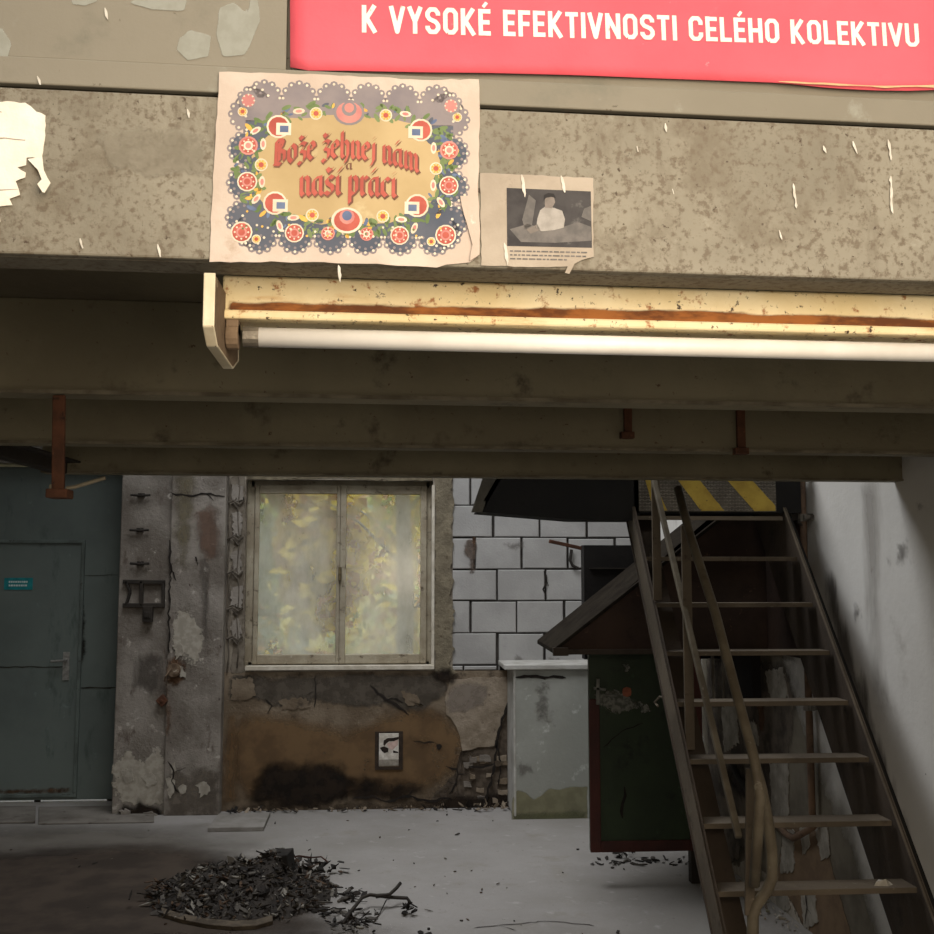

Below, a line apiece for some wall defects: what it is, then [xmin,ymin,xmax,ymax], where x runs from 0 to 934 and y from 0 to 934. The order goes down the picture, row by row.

peeling [131,0,186,11]
peeling [177,0,260,60]
water stain [176,476,218,557]
crack [172,492,225,500]
crack [167,540,176,653]
peeling [172,608,205,666]
flaking render [229,476,509,808]
crack [370,685,409,715]
peeling [111,747,219,816]
crack [167,761,186,793]
water stain [225,709,463,811]